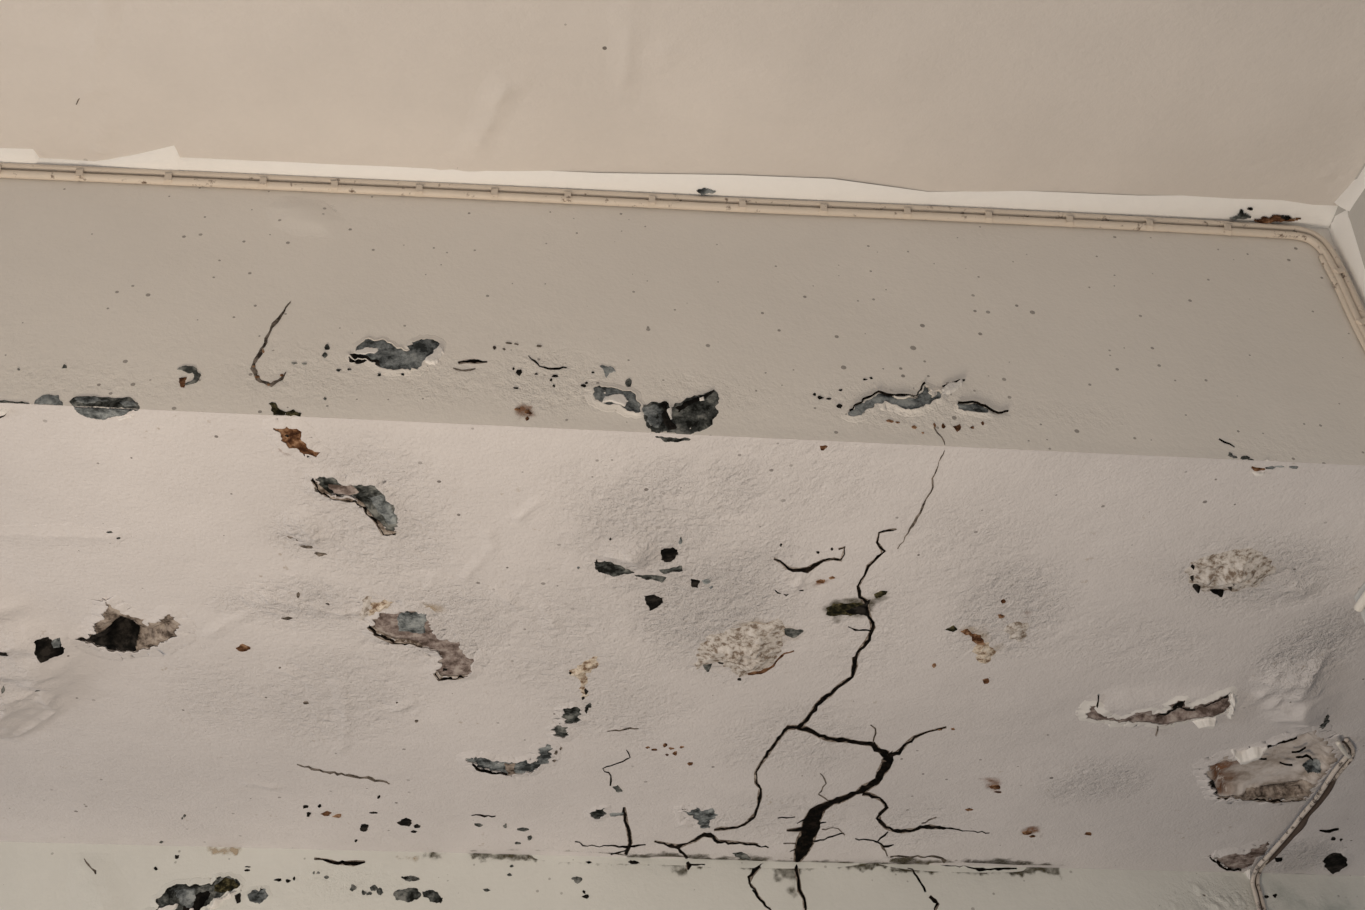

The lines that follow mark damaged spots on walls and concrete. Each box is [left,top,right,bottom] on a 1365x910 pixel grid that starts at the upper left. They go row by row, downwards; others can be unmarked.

crack [250,301,291,387]
peeling [322,335,447,377]
peeling [0,394,140,421]
peeling [580,365,719,442]
peeling [261,402,416,541]
peeling [51,595,197,661]
peeling [357,596,490,684]
peeling [456,702,593,779]
crack [571,428,988,910]
peeling [1075,679,1248,736]
peeling [1192,722,1356,807]
peeling [144,866,295,910]